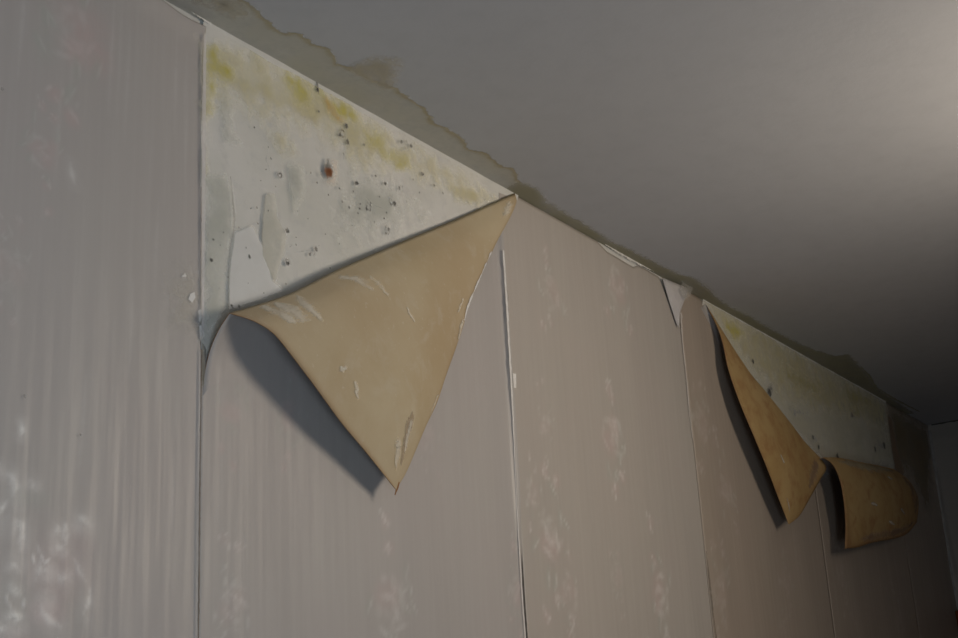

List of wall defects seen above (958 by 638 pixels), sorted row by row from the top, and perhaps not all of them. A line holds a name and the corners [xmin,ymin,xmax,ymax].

flaking render [200,21,519,354]
damp [166,0,929,510]
flaking render [702,299,894,469]